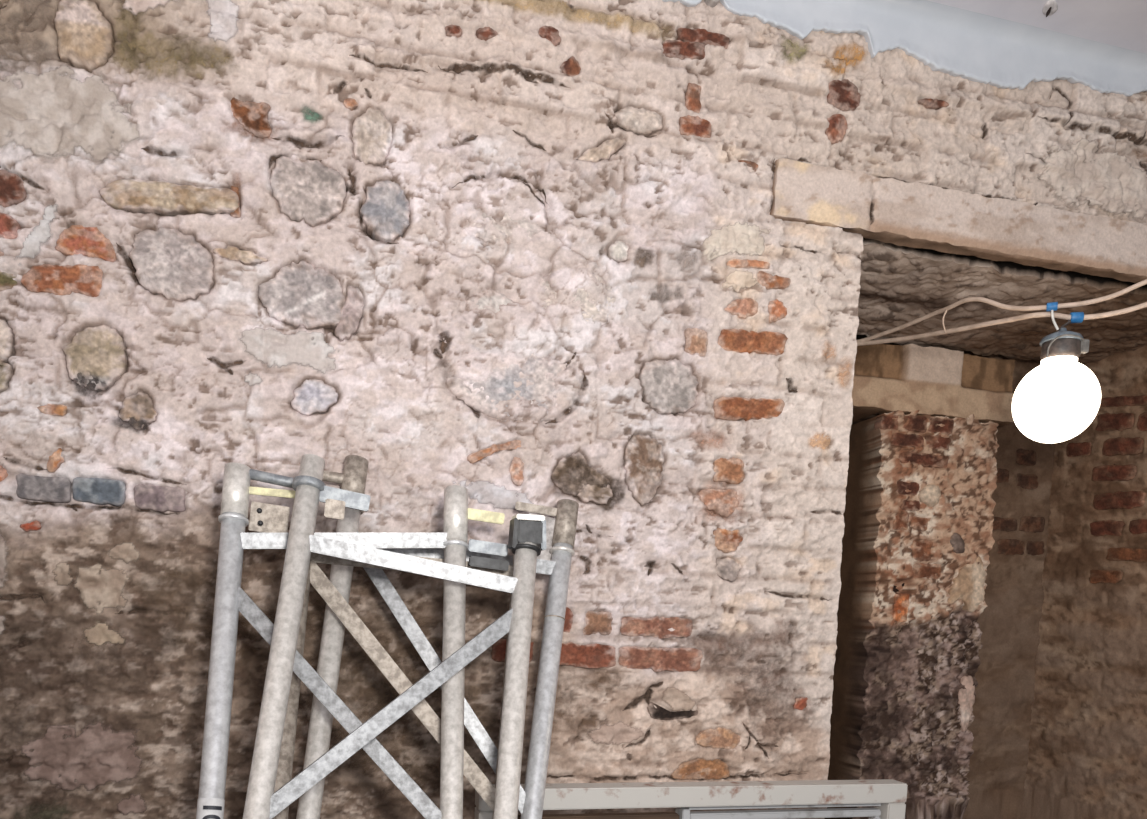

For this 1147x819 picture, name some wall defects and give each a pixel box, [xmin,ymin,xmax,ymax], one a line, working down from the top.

peeling [662,0,1147,97]
crack [1043,88,1147,172]